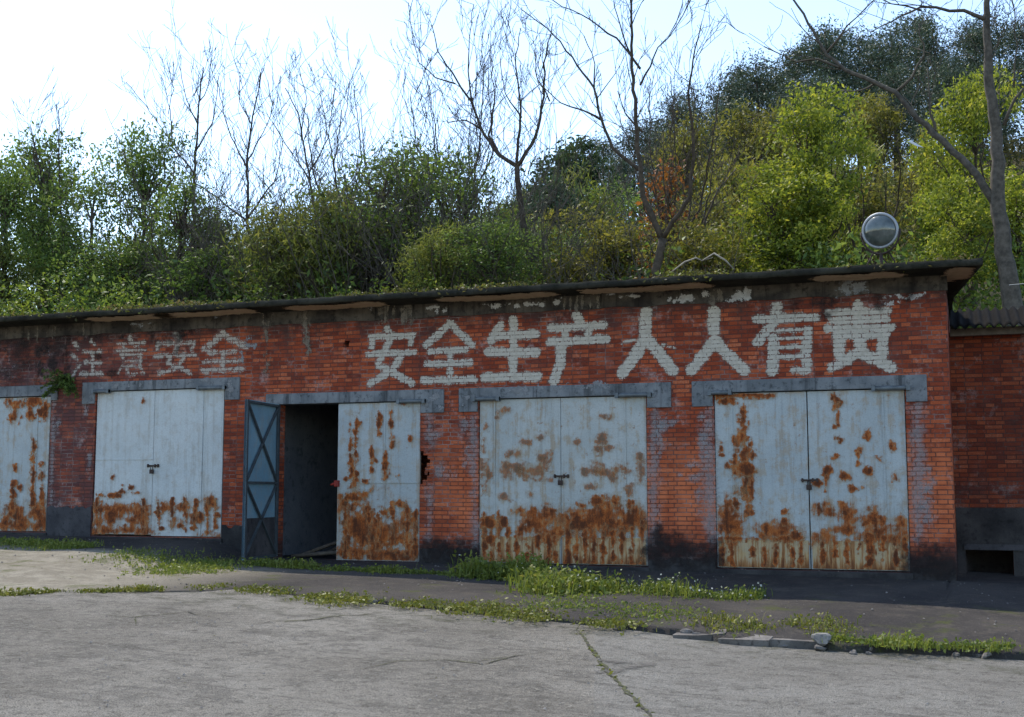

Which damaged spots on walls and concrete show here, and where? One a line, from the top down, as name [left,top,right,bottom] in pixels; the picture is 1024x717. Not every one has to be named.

rust [3,397,50,425]
rust [0,438,46,531]
rust [92,474,221,537]
rust [336,403,419,561]
rust [479,406,647,565]
rust [715,392,909,569]
crack [576,627,652,717]